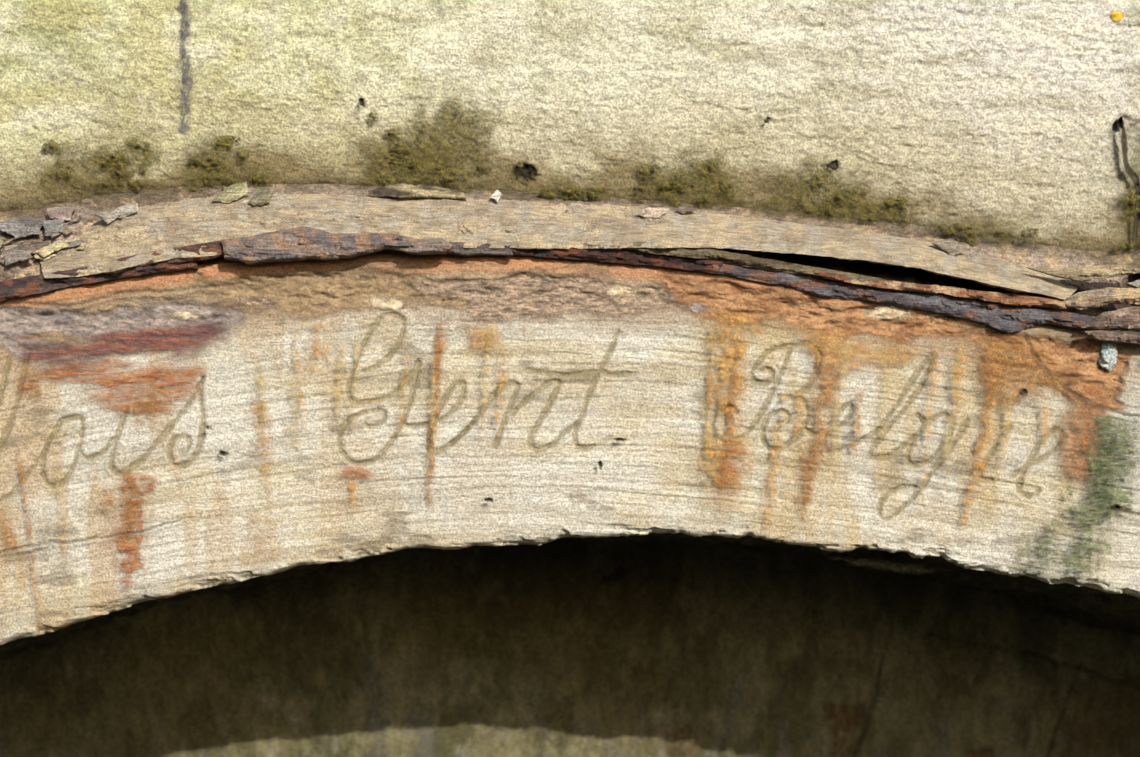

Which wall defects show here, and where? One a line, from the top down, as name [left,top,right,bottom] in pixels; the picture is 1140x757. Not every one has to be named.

spalling [0,207,75,266]
rust [19,323,224,423]
spalling [212,182,274,206]
spalling [0,265,1130,409]
rust [701,313,756,497]
rust [766,331,915,521]
rust [813,270,1067,309]
rust [961,338,1110,524]
crack [1120,117,1140,249]
rust [109,473,156,586]